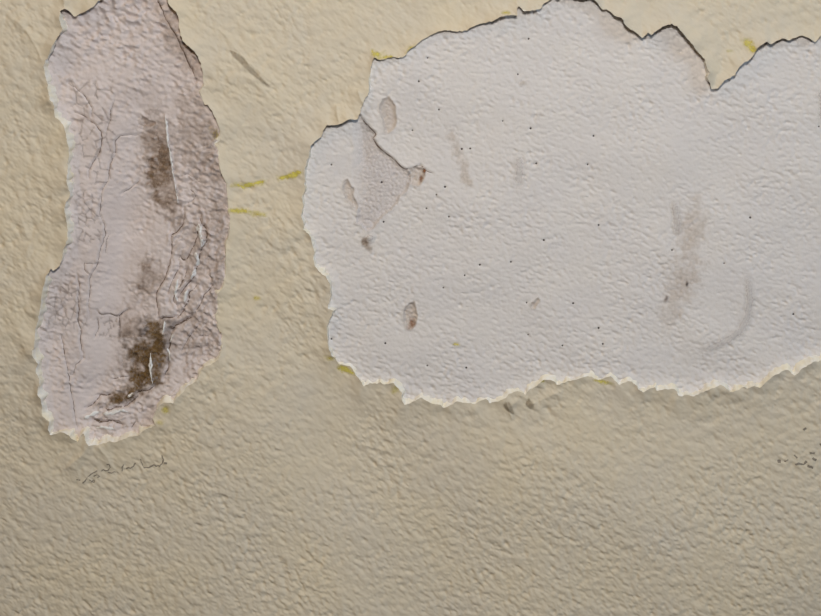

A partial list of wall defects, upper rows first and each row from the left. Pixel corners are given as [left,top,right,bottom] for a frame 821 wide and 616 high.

crack [73,86,136,336]
peeling [32,0,230,481]
water stain [110,321,166,403]
crack [88,174,211,428]
water stain [148,147,170,187]
peeling [301,0,821,418]